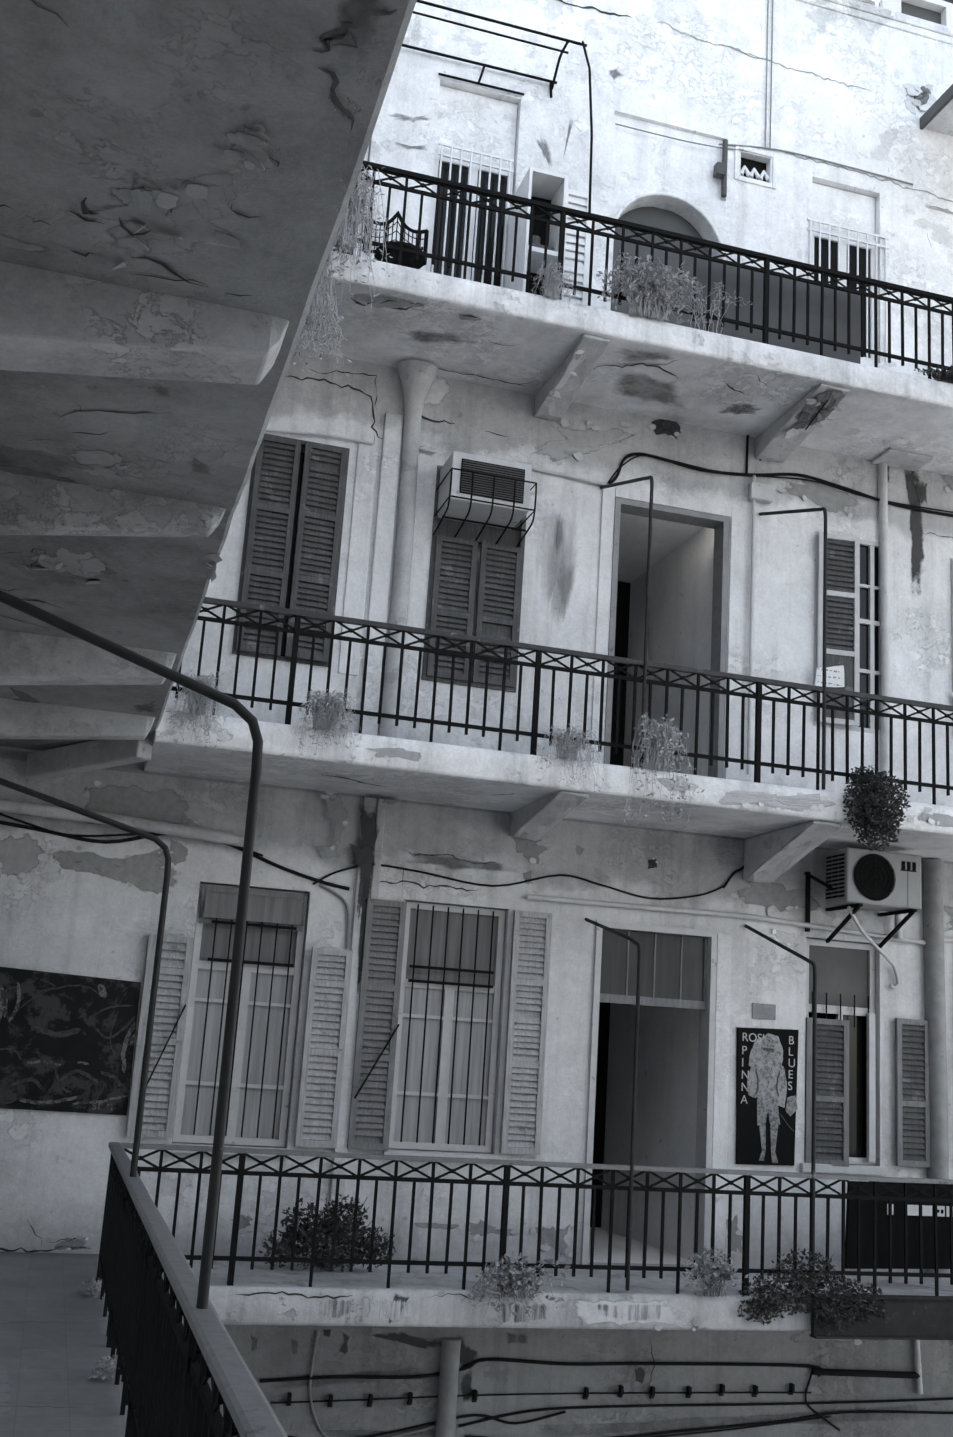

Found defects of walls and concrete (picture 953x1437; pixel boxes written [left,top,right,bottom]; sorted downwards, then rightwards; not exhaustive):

crack [31,0,69,27]
crack [312,8,397,130]
peeling [69,123,280,287]
crack [285,368,383,440]
peeling [546,350,584,402]
peeling [534,378,685,465]
peeling [629,352,669,360]
spalling [785,391,845,438]
peeling [1,547,108,584]
damp [551,522,571,608]
peeling [0,780,198,894]
damp [350,806,379,989]